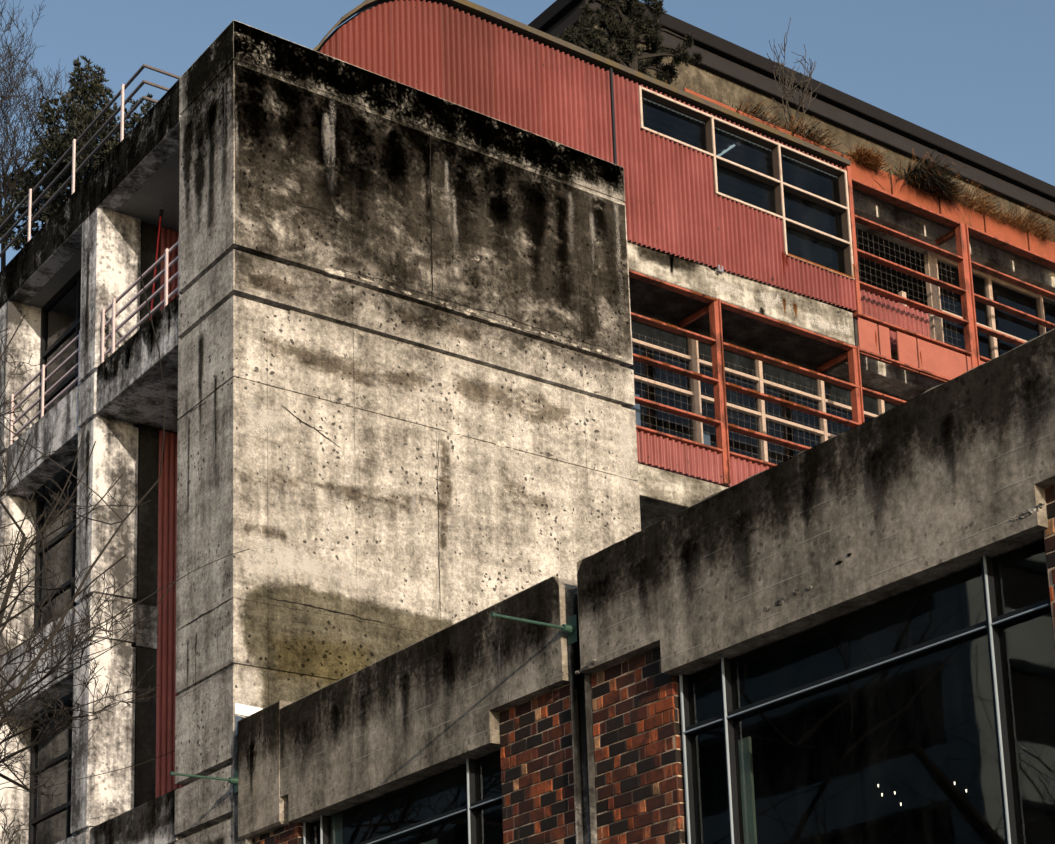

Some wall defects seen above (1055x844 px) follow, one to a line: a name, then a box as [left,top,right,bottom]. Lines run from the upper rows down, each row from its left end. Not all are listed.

damp [0,20,624,308]